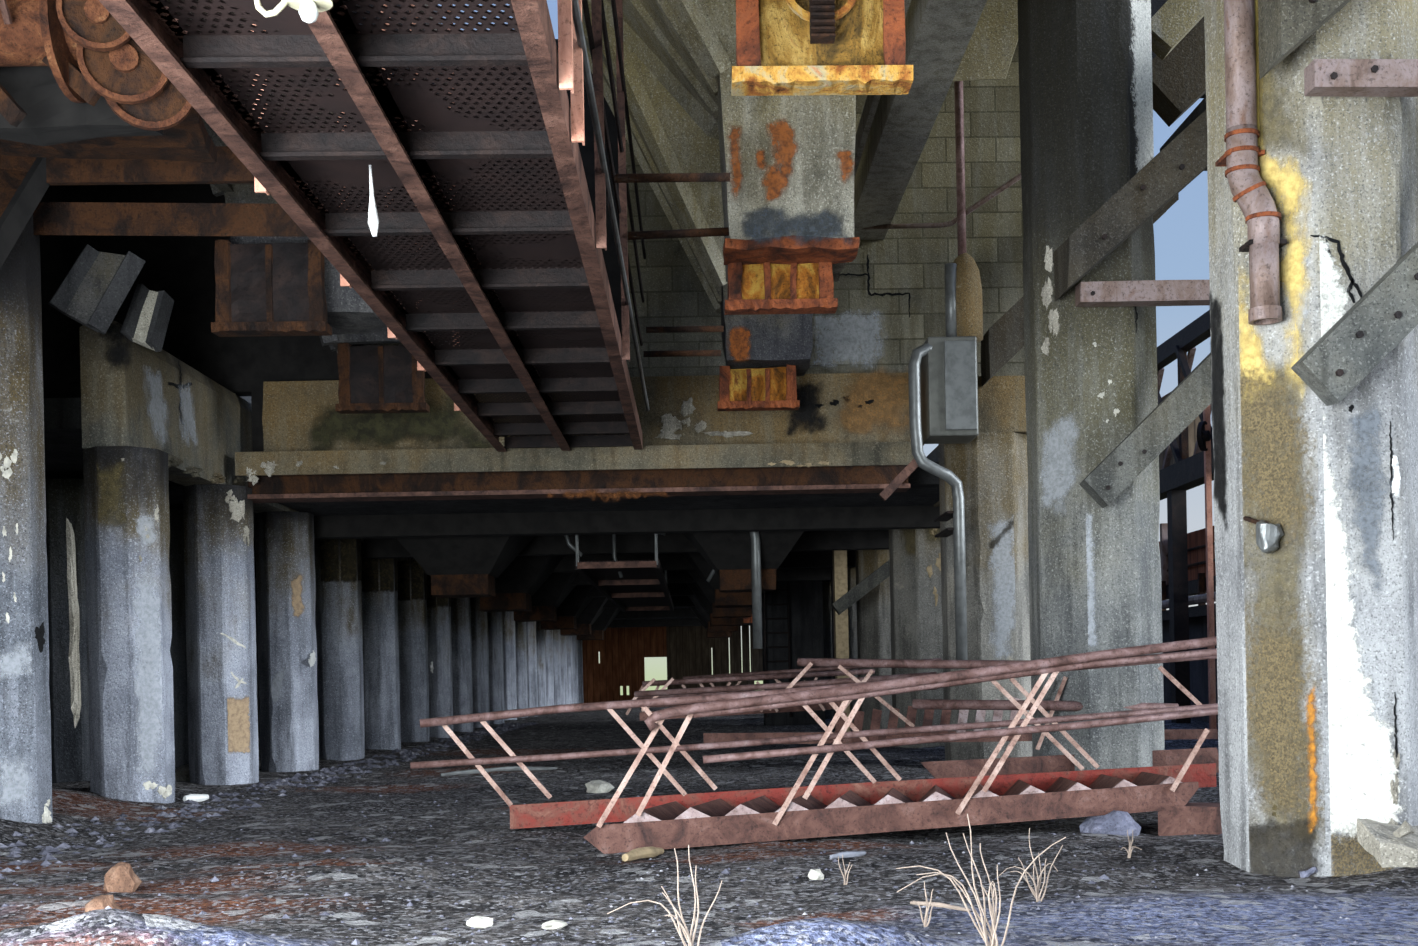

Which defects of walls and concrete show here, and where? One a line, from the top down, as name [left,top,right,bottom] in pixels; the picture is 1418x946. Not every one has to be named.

corrosion [728,119,797,201]
corrosion [837,151,854,182]
crack [1310,235,1362,303]
peeling [0,449,18,479]
corrosion [548,490,665,500]
damp [788,383,826,435]
damp [1209,0,1401,877]
peeling [2,523,18,624]